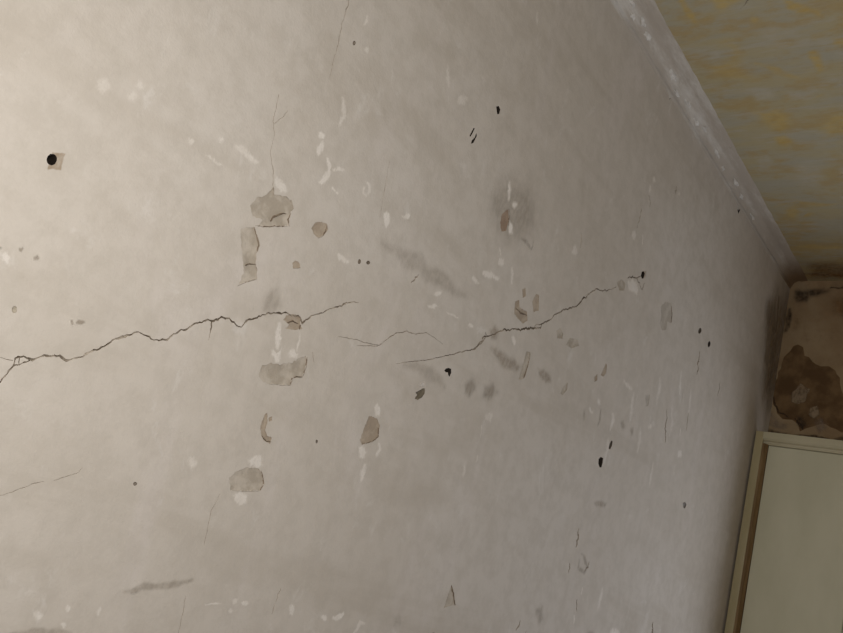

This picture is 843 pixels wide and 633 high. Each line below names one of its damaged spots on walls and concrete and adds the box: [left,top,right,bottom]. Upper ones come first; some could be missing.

flaking render [238,188,294,286]
flaking render [311,222,328,238]
crack [339,276,645,364]
flaking render [514,288,539,323]
crack [0,301,359,383]
water stain [765,304,791,393]
flaking render [259,352,314,386]
peeling [773,345,843,432]
flaking render [260,413,272,443]
flaking render [360,416,380,444]
flaking render [229,467,264,492]